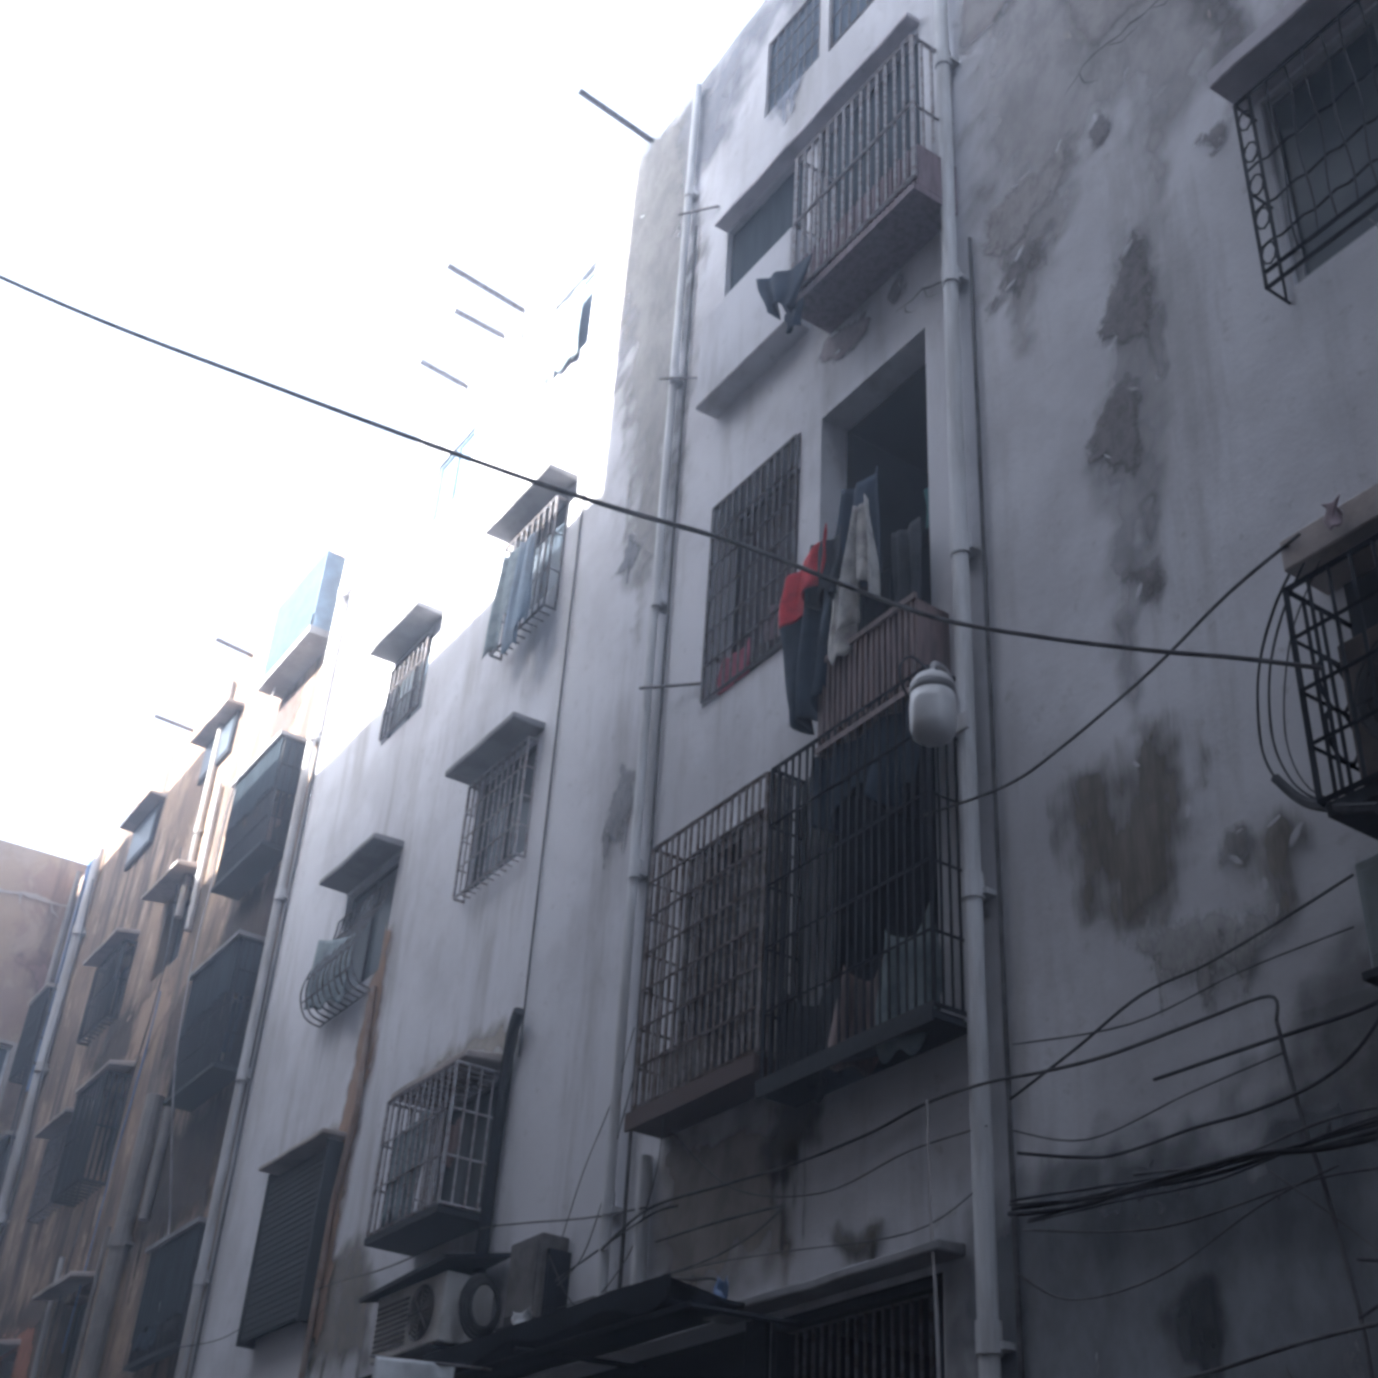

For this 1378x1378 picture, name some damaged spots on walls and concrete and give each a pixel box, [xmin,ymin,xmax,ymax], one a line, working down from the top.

damp [379,0,796,584]
damp [982,0,1237,348]
damp [1100,284,1164,596]
damp [1136,909,1278,1010]
rust [312,927,392,1346]
damp [664,1099,820,1286]
damp [1163,1275,1222,1378]